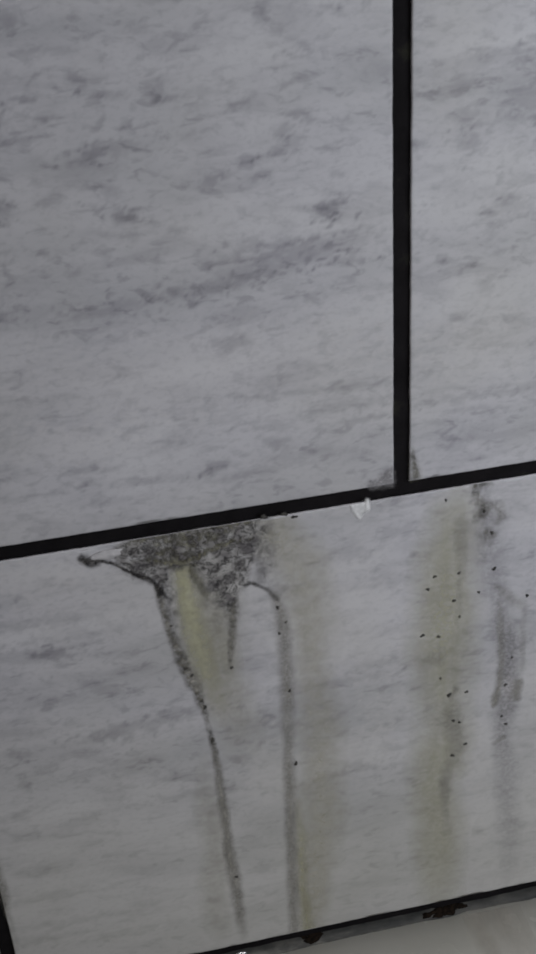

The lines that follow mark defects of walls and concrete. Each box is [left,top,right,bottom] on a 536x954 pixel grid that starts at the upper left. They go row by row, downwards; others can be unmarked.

damp [79,514,268,718]
damp [210,732,243,915]
damp [276,599,324,944]